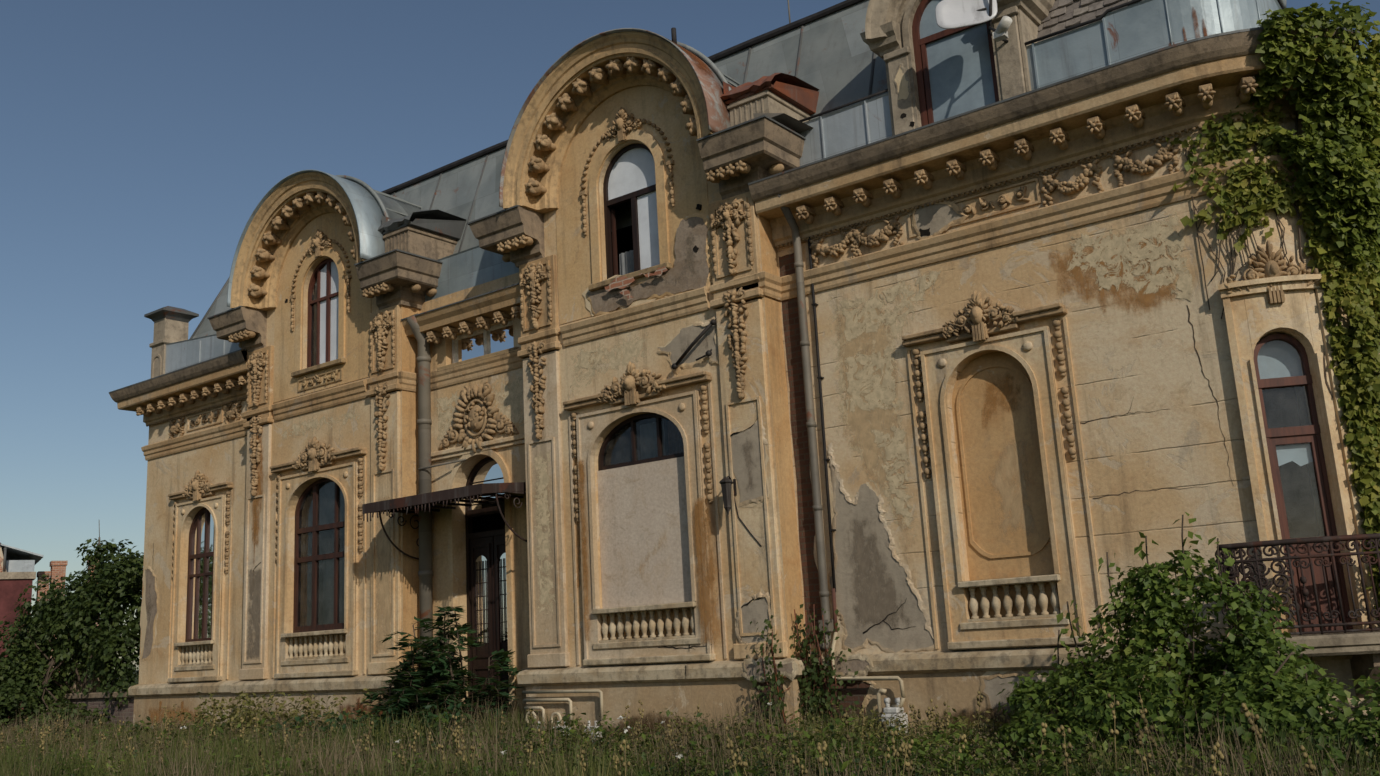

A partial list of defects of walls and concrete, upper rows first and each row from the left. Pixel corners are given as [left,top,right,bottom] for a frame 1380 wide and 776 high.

peeling [582,204,712,317]
flaking render [777,251,795,277]
peeling [1067,212,1193,301]
crack [1081,305,1234,499]
peeling [780,270,941,731]